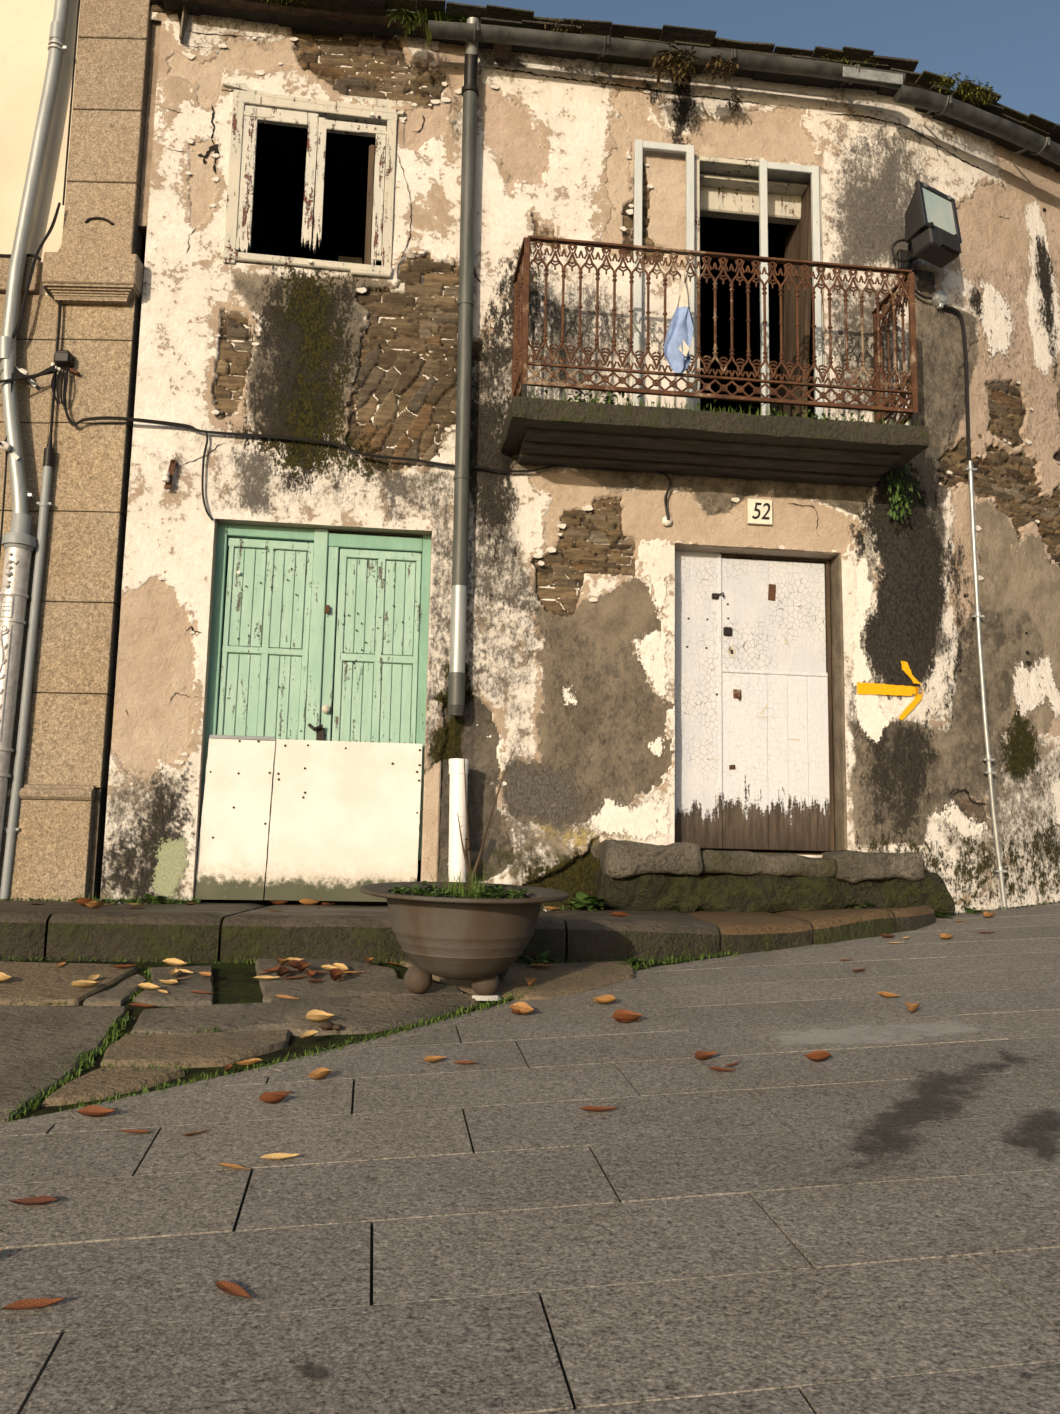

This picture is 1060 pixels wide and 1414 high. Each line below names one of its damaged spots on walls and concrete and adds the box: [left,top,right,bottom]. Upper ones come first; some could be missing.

flaking render [167,31,550,195]
spalling [531,215,561,251]
damp [824,111,938,293]
flaking render [211,310,259,420]
damp [230,265,366,515]
flaking render [346,251,486,475]
peeling [937,144,1060,736]
peeling [421,472,860,886]
damp [846,455,988,850]
damp [1000,650,1060,825]
damp [101,762,195,902]
damp [853,1052,1032,1168]